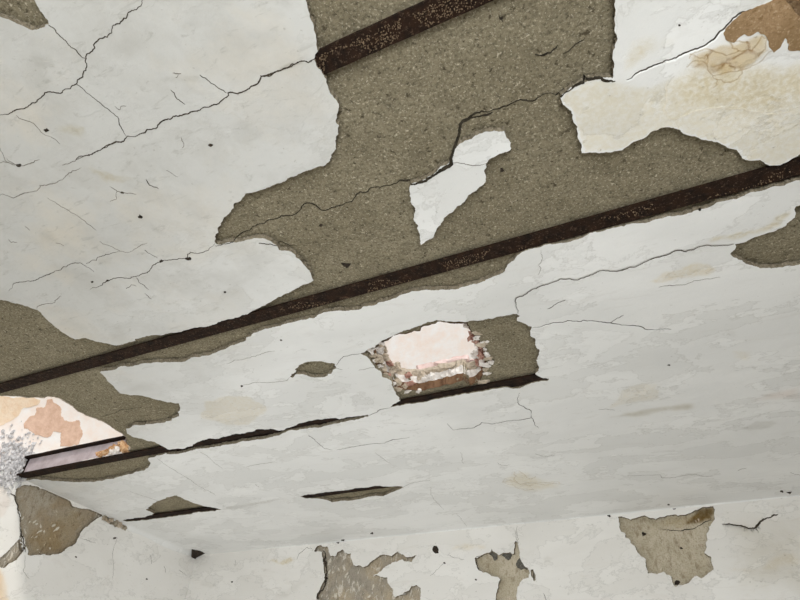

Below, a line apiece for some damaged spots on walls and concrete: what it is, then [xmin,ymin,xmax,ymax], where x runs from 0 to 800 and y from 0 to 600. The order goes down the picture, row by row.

peeling [724,0,800,52]
crack [1,1,751,299]
spalling [216,0,769,311]
spalling [731,205,800,264]
crack [513,243,734,313]
crack [534,300,671,331]
spalling [0,253,539,568]
spalling [315,539,421,600]
spalling [475,542,536,600]
spalling [607,504,715,587]
crack [664,514,778,534]